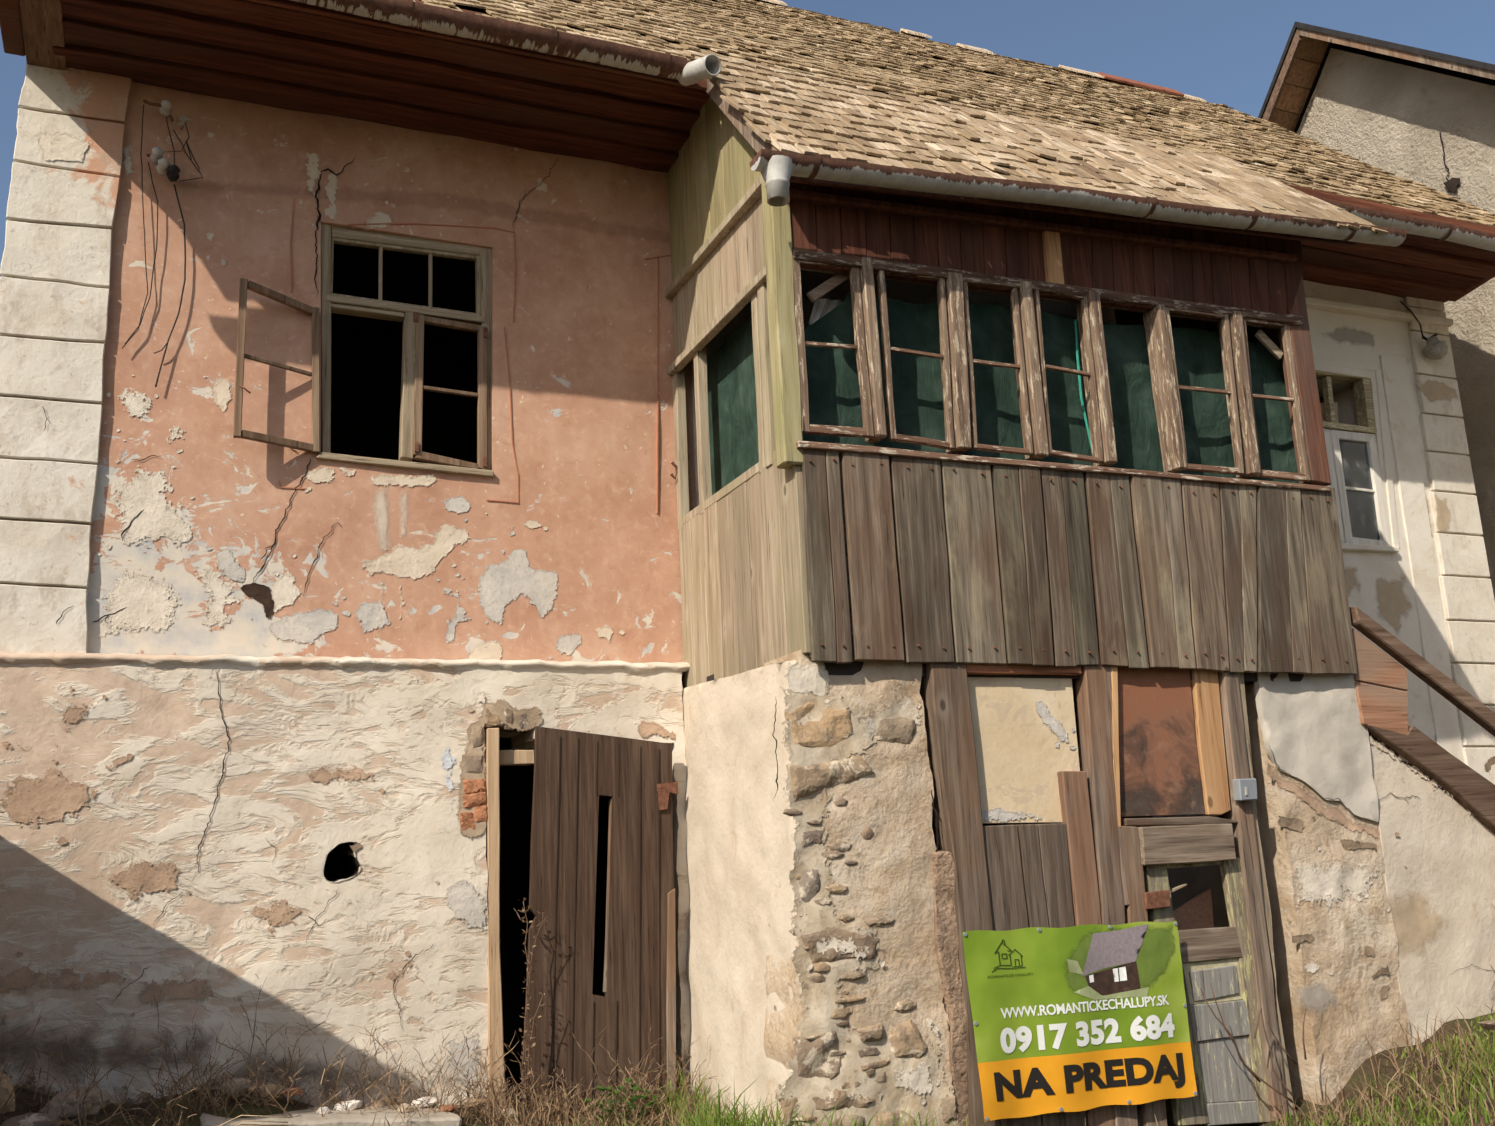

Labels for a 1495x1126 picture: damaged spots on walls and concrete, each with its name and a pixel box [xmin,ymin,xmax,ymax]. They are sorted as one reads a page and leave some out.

crack [1440,132,1449,181]
crack [314,157,355,290]
crack [253,459,311,582]
peeling [96,374,559,660]
crack [302,523,342,599]
damp [1345,569,1411,630]
peeling [548,624,625,659]
crack [154,672,230,922]
spalling [441,692,555,839]
peeling [1284,838,1390,912]
spalling [1292,933,1333,976]
spalling [1364,946,1390,1000]